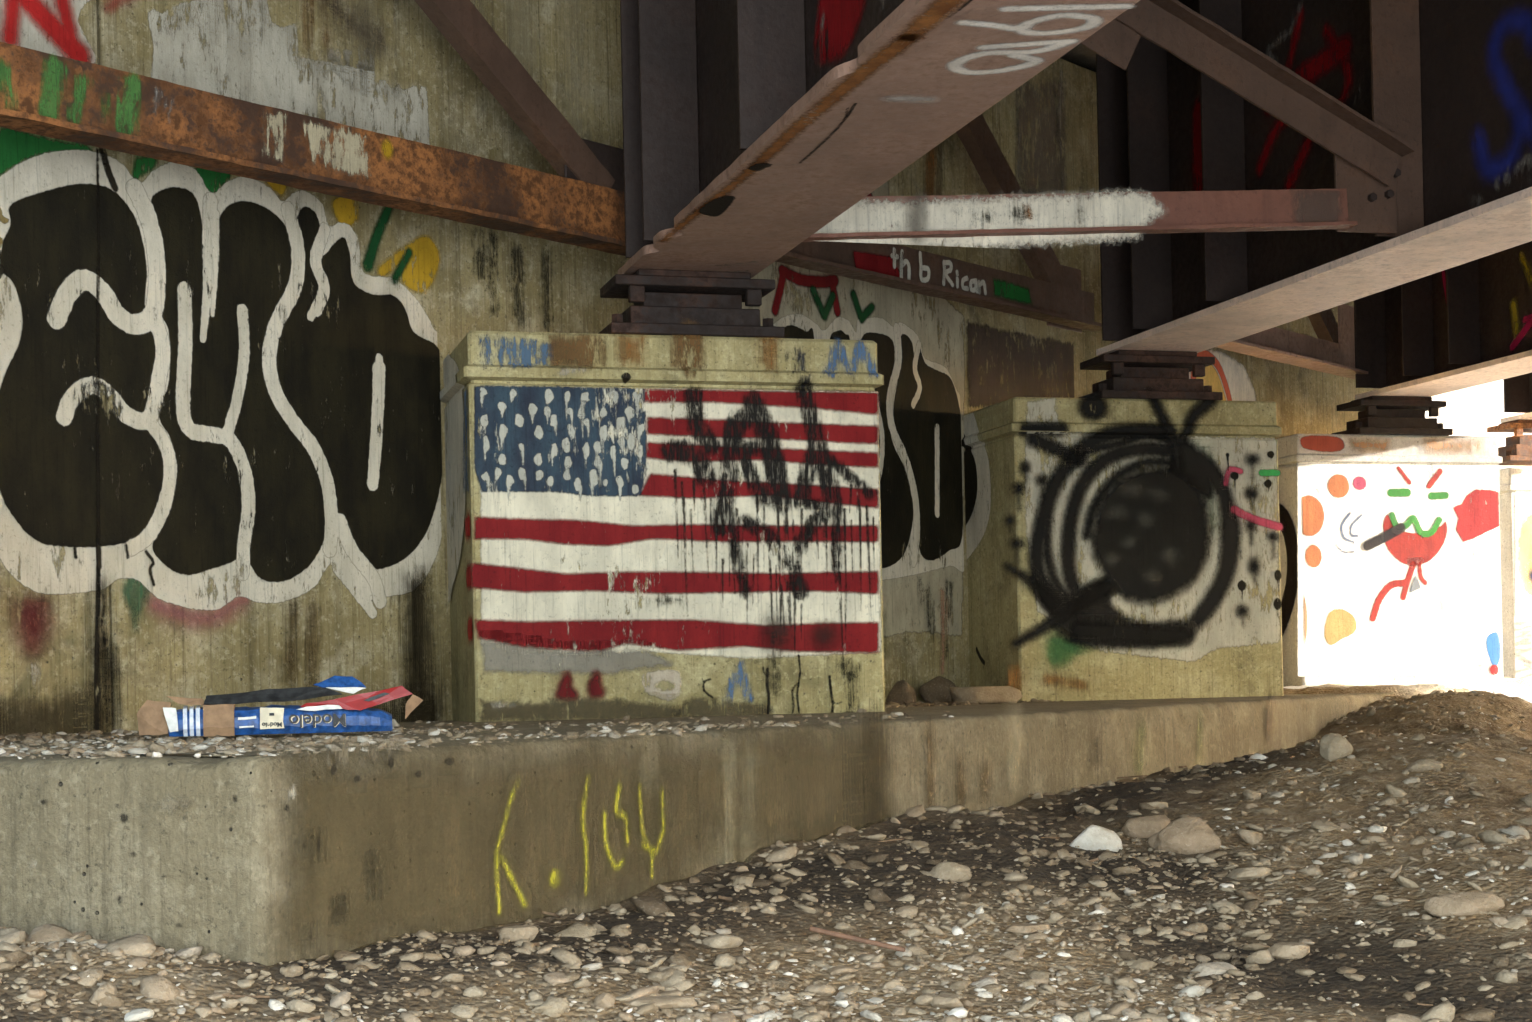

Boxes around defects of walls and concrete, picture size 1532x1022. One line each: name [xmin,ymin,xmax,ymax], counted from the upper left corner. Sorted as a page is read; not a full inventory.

rust [659,0,965,242]
water stain [0,583,120,736]
water stain [370,570,437,722]